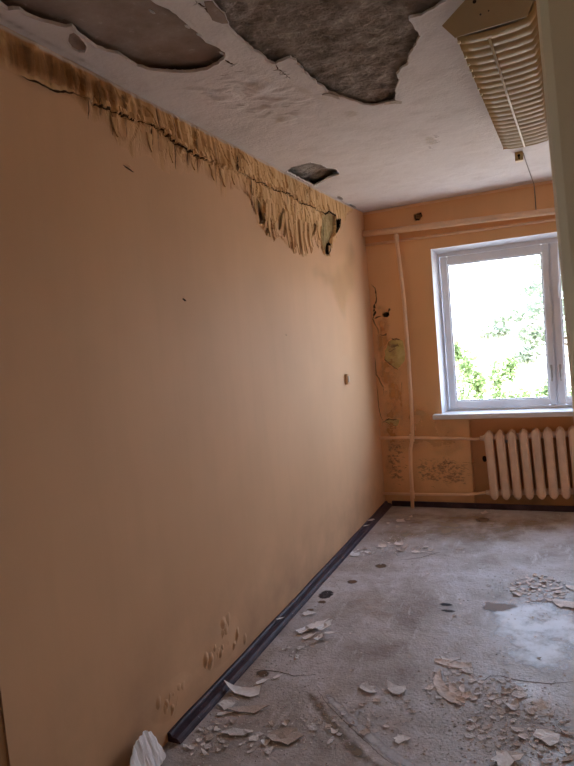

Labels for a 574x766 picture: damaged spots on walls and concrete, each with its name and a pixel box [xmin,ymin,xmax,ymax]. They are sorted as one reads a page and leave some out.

flaking render [0,0,229,74]
flaking render [204,0,449,106]
crack [20,68,212,169]
peeling [0,25,356,258]
crack [237,156,325,213]
leakage [484,602,574,666]